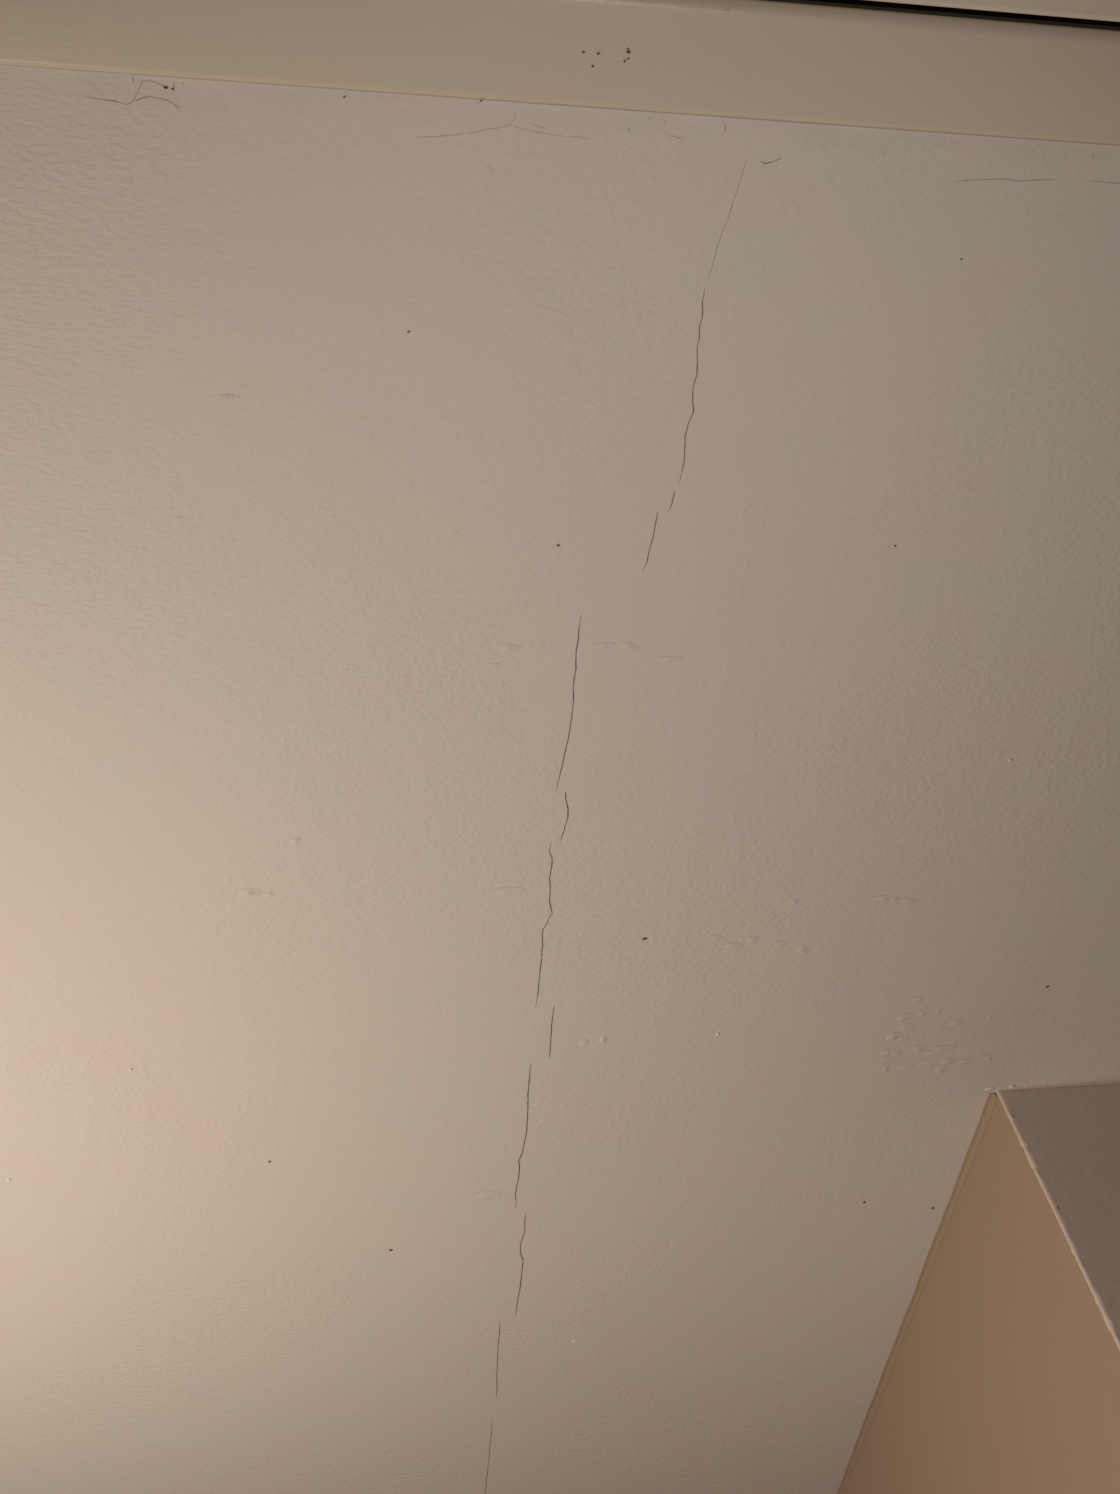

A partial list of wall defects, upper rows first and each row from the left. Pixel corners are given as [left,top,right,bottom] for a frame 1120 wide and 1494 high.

crack [485,618,581,1492]